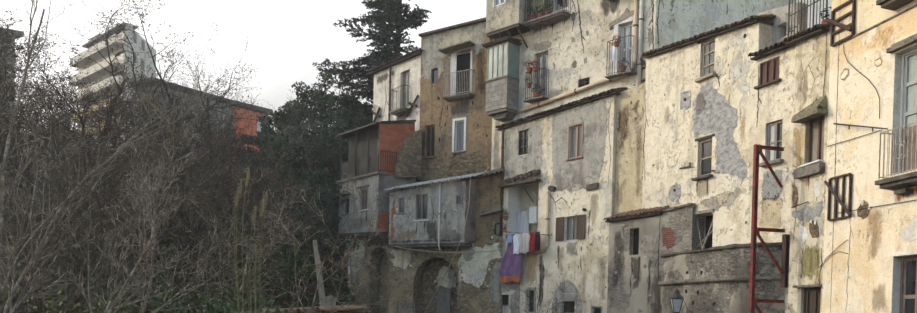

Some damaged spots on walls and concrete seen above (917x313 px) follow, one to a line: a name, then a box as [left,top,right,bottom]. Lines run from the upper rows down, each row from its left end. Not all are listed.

crack [571,0,586,53]
spalling [691,82,750,184]
damp [869,213,879,256]